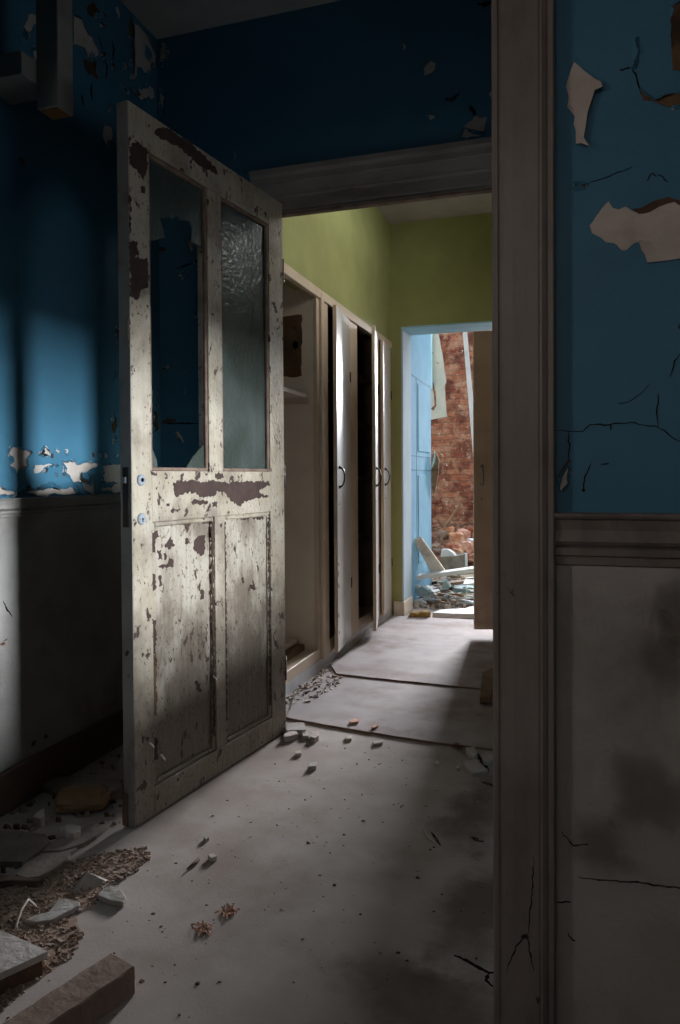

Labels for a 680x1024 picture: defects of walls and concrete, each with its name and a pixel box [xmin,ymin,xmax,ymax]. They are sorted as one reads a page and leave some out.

peeling [73,2,107,79]
peeling [128,17,156,102]
peeling [566,62,603,146]
peeling [620,36,680,110]
peeling [590,197,680,263]
crack [556,355,680,442]
peeling [0,410,121,497]
crack [454,857,534,987]
crack [579,877,680,889]